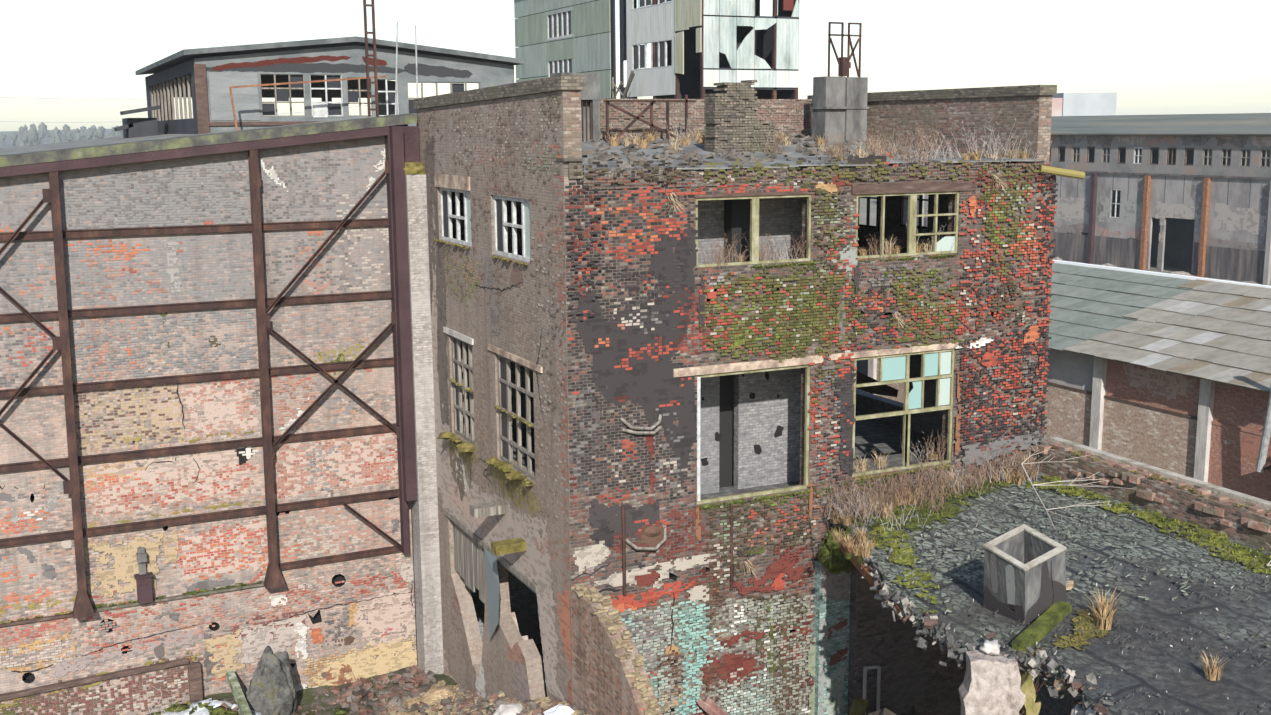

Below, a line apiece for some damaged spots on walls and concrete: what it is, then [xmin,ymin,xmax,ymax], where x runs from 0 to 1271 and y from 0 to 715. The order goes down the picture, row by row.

flaking render [63,238,159,295]
flaking render [2,325,56,367]
flaking render [73,292,337,516]
flaking render [614,164,1271,533]
flaking render [0,424,417,715]
peeling [1008,480,1218,600]
water stain [744,596,812,715]